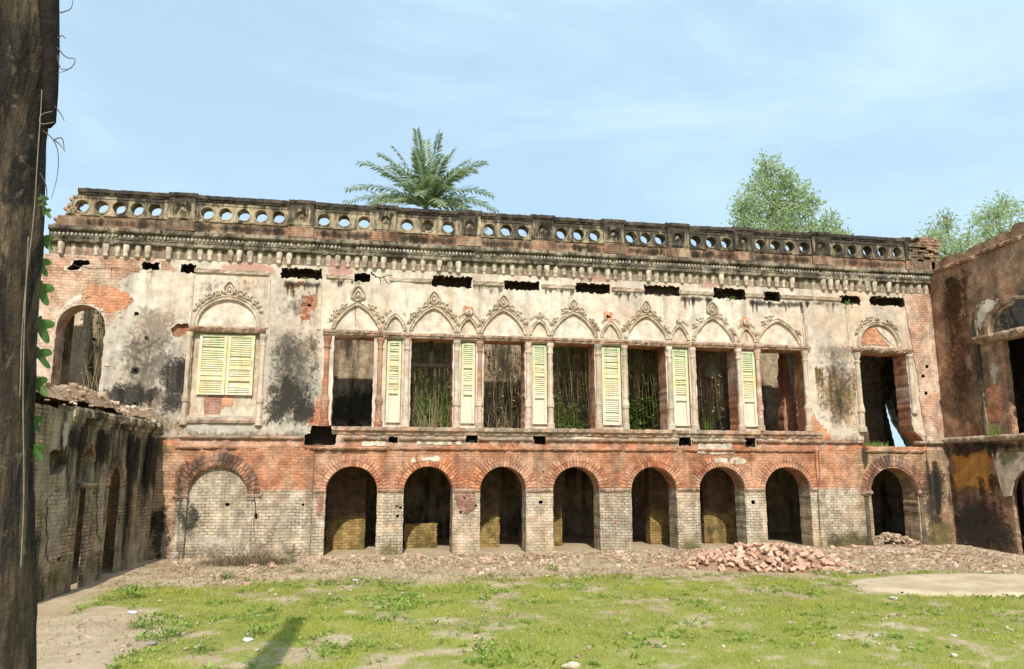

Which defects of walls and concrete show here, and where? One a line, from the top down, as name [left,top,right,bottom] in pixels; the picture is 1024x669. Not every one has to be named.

flaking render [39,253,176,382]
spalling [171,324,189,337]
flaking render [284,281,318,321]
damp [103,355,203,416]
flaking render [203,395,225,415]
damp [263,374,315,425]
damp [63,421,83,466]
damp [95,432,110,479]
damp [126,434,159,499]
damp [947,442,1021,458]
spalling [454,487,477,514]
damp [922,460,1017,554]